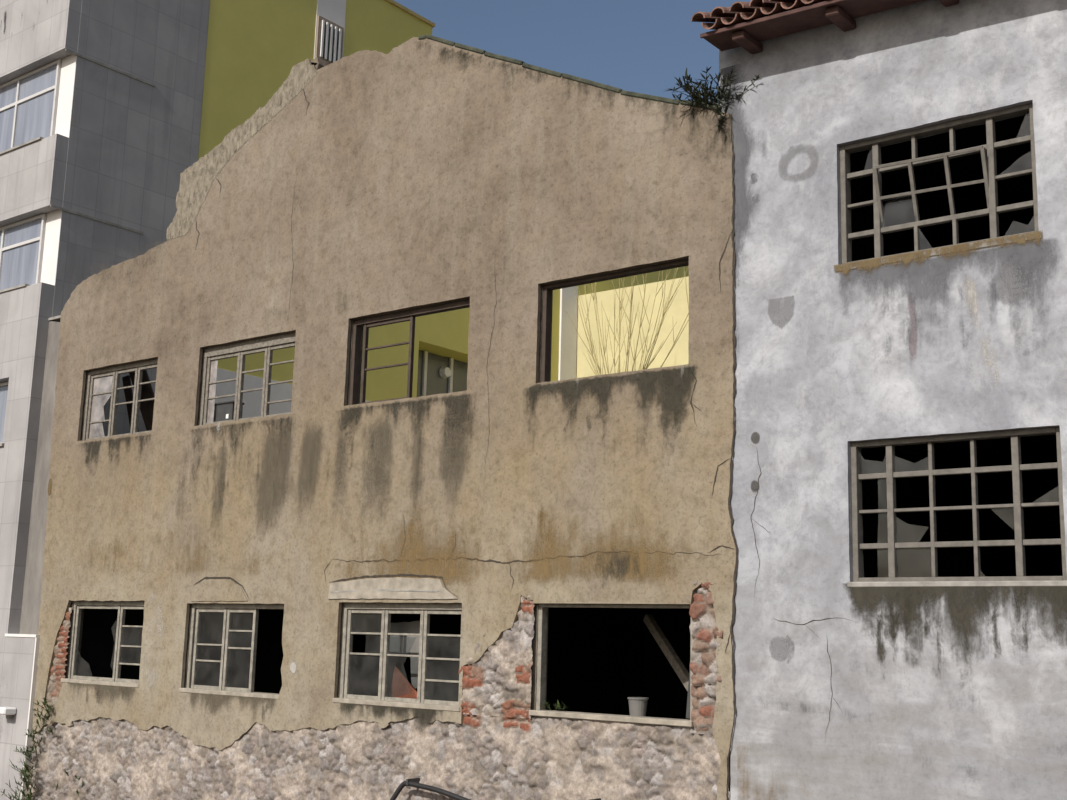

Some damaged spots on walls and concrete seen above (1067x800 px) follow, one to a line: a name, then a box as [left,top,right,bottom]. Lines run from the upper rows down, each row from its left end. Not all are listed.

damp [83,435,150,464]
damp [212,422,250,512]
damp [257,417,321,523]
damp [336,394,473,494]
crack [324,118,770,797]
damp [526,366,695,431]
damp [845,583,1067,662]
flaking render [27,580,730,800]
crack [785,618,849,736]